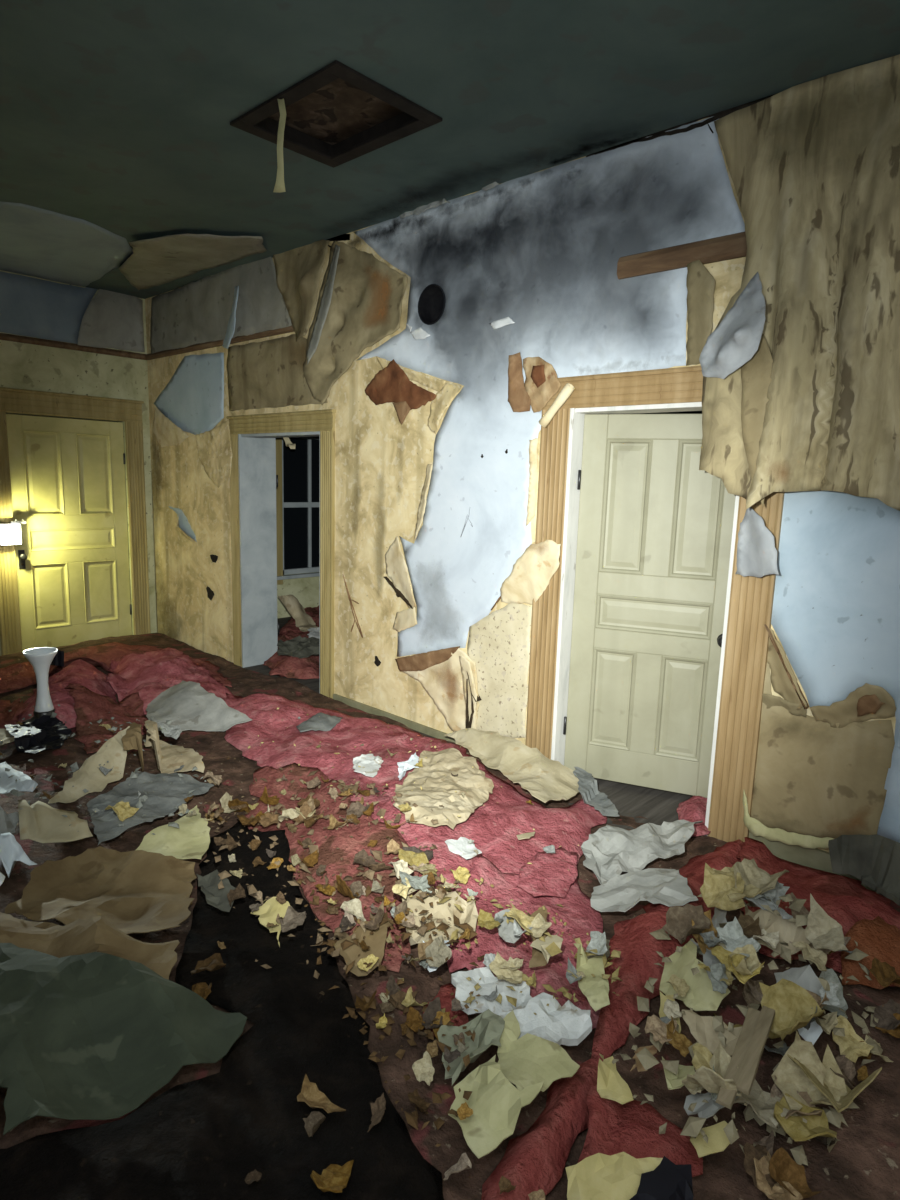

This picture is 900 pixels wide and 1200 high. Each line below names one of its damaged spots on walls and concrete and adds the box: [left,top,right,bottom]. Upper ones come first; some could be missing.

flaking render [0,202,133,344]
flaking render [153,353,233,488]
flaking render [354,116,745,657]